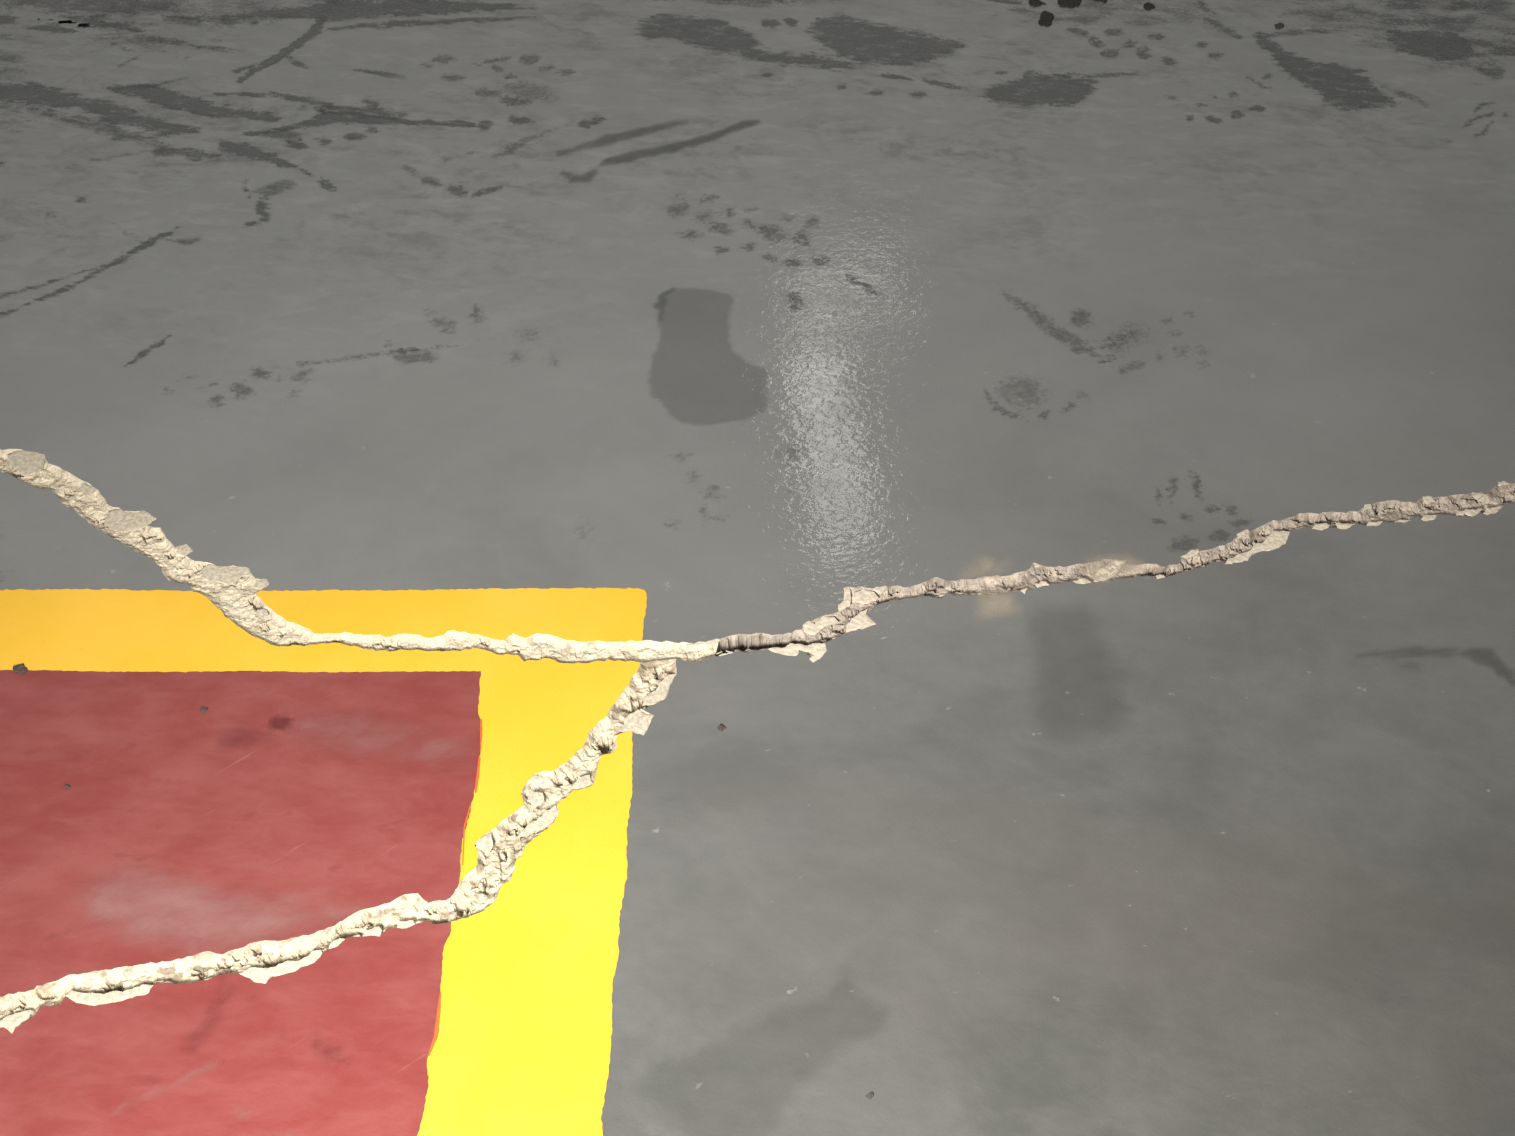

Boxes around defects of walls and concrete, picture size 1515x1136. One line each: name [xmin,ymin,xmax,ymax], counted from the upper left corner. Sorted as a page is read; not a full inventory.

crack [0,449,1515,1033]